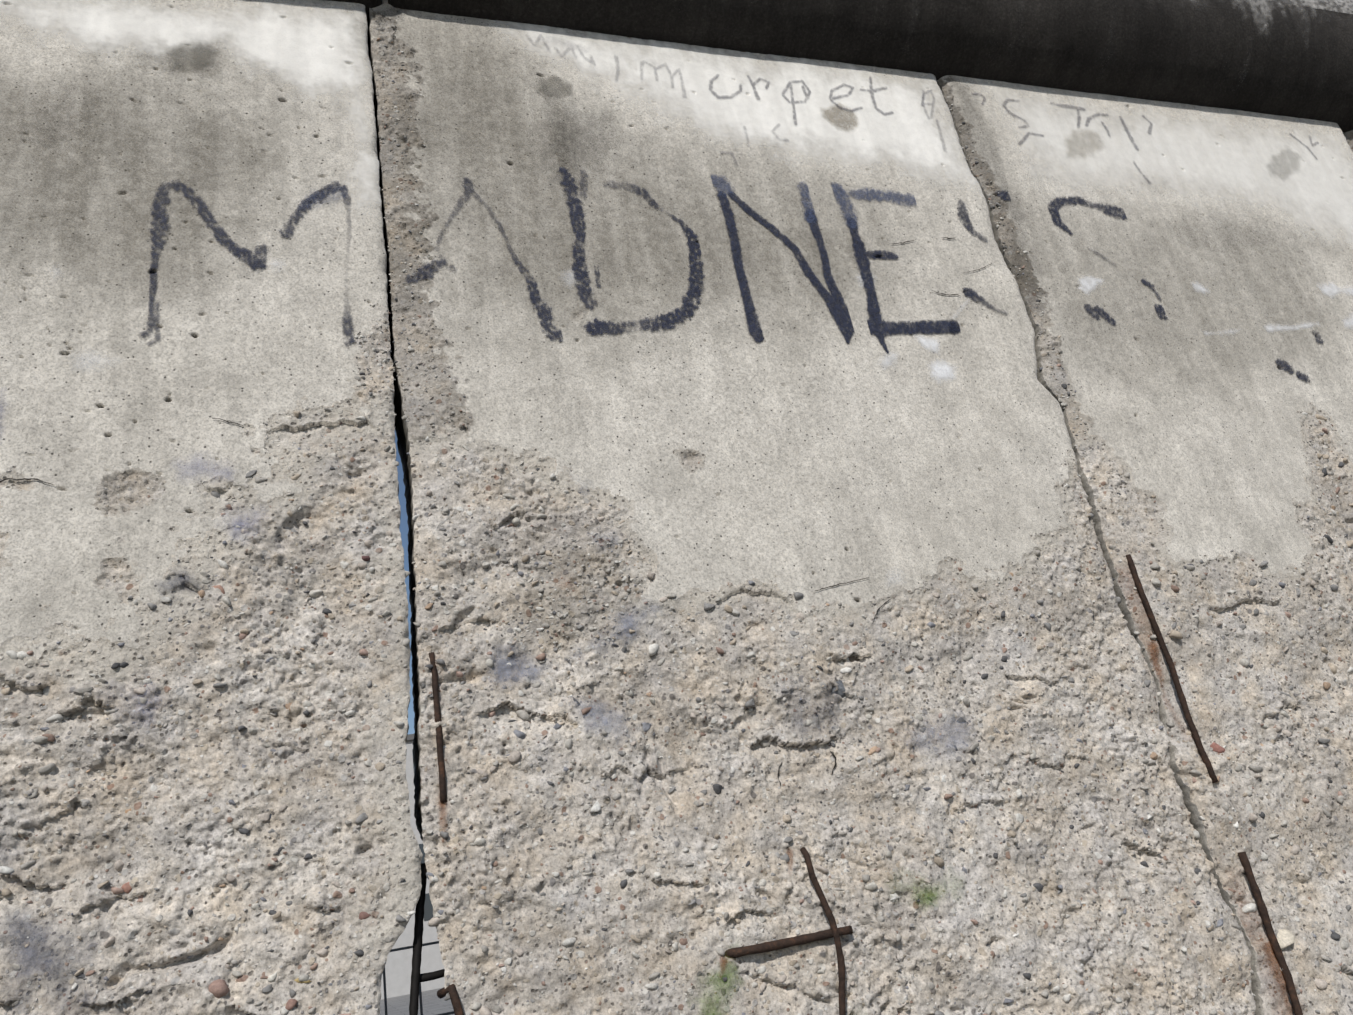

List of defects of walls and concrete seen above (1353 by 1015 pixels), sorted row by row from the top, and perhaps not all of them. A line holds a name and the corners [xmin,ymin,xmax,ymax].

spalling [0,304,423,1015]
spalling [369,8,1353,1015]